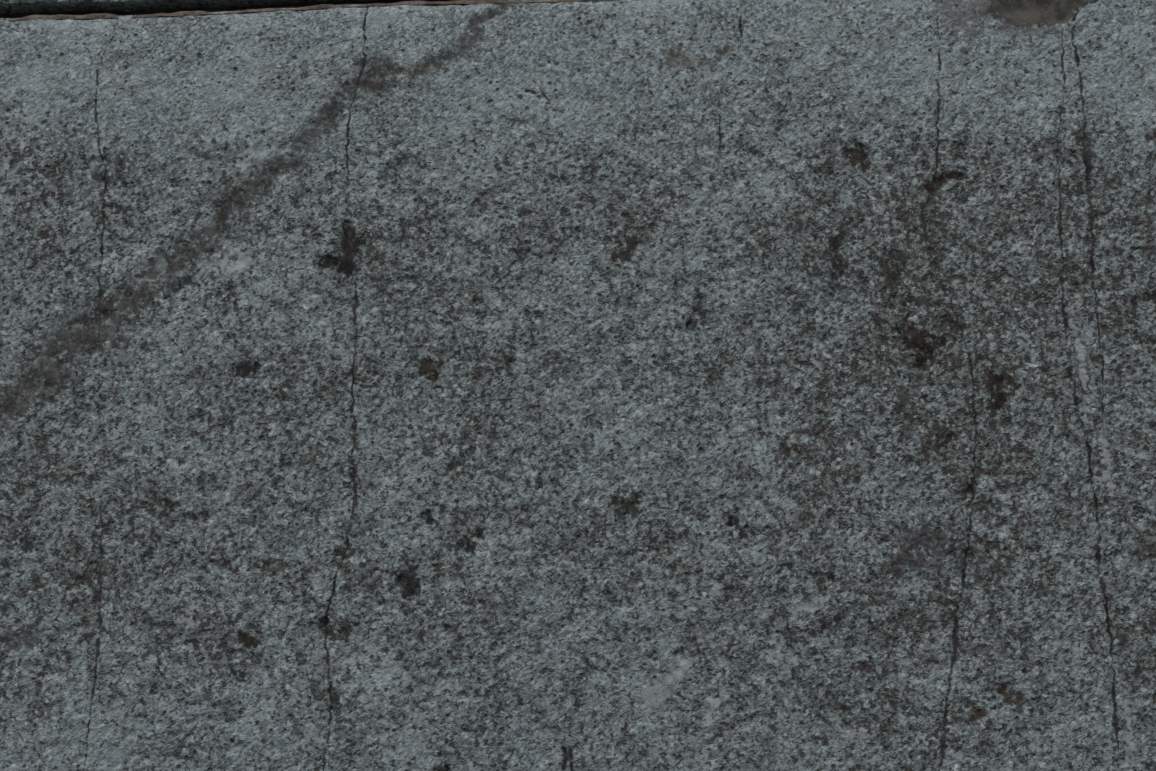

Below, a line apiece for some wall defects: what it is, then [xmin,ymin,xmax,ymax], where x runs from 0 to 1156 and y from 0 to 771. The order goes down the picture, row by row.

damp [0,3,514,436]
crack [322,6,369,770]
damp [446,444,476,474]
crack [921,18,978,771]
crack [1056,27,1138,771]